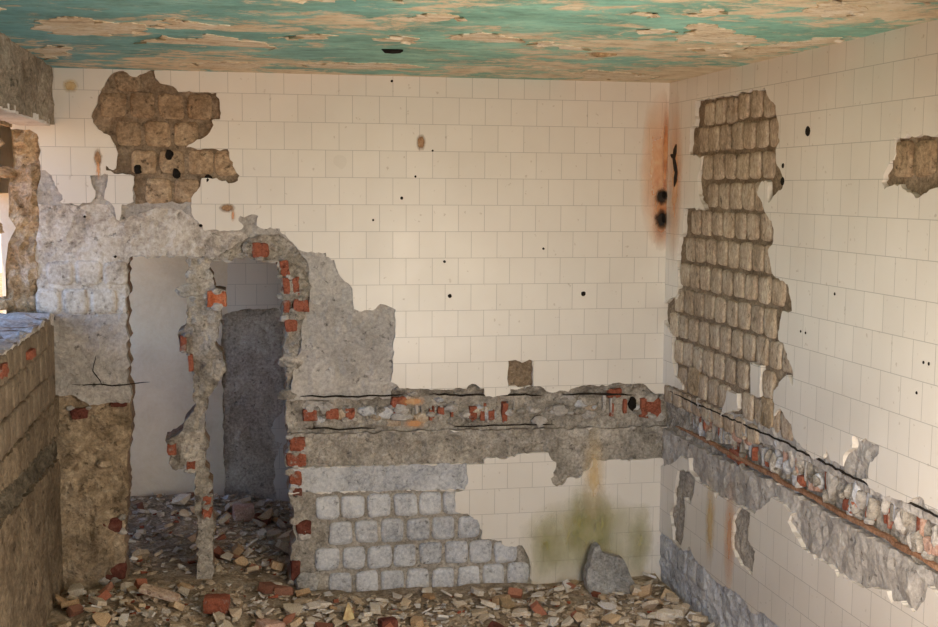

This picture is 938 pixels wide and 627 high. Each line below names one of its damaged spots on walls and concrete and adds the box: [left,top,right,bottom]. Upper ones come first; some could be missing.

peeling [26,45,73,61]
peeling [30,16,339,51]
peeling [372,35,420,45]
peeling [408,13,467,22]
peeling [445,32,592,51]
corrosion [654,126,677,234]
flaking render [0,71,532,627]
peeling [606,90,938,627]
corrosion [676,426,938,571]